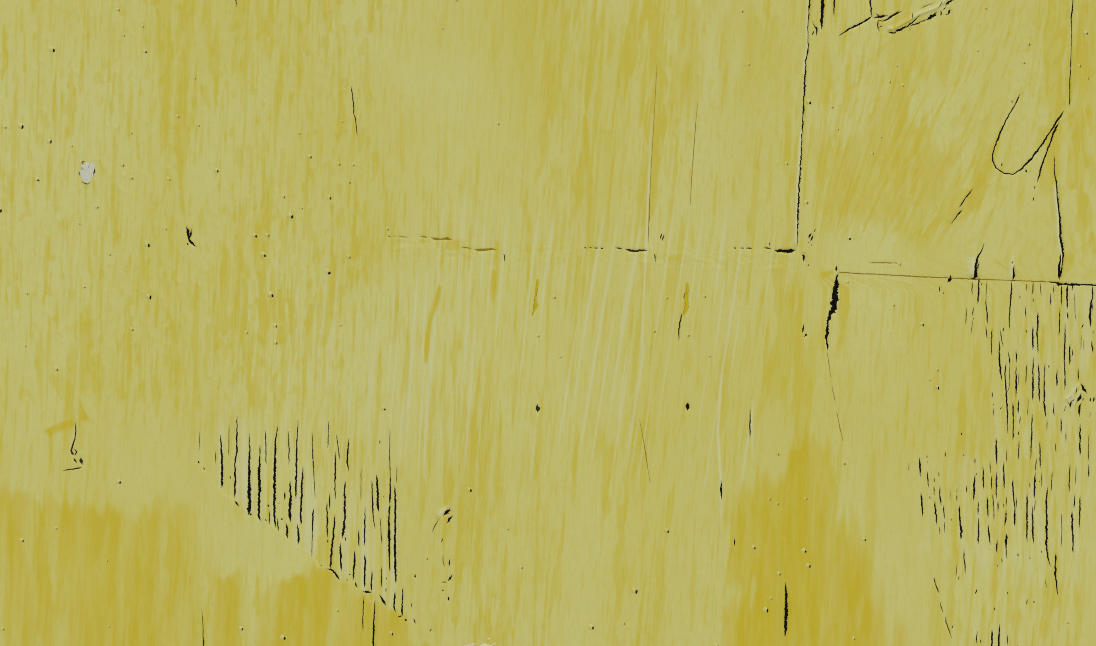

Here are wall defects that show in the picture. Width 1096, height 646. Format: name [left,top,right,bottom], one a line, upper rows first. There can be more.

crack [734,0,900,253]
crack [825,159,1096,646]
crack [198,420,415,646]
crack [782,582,790,636]